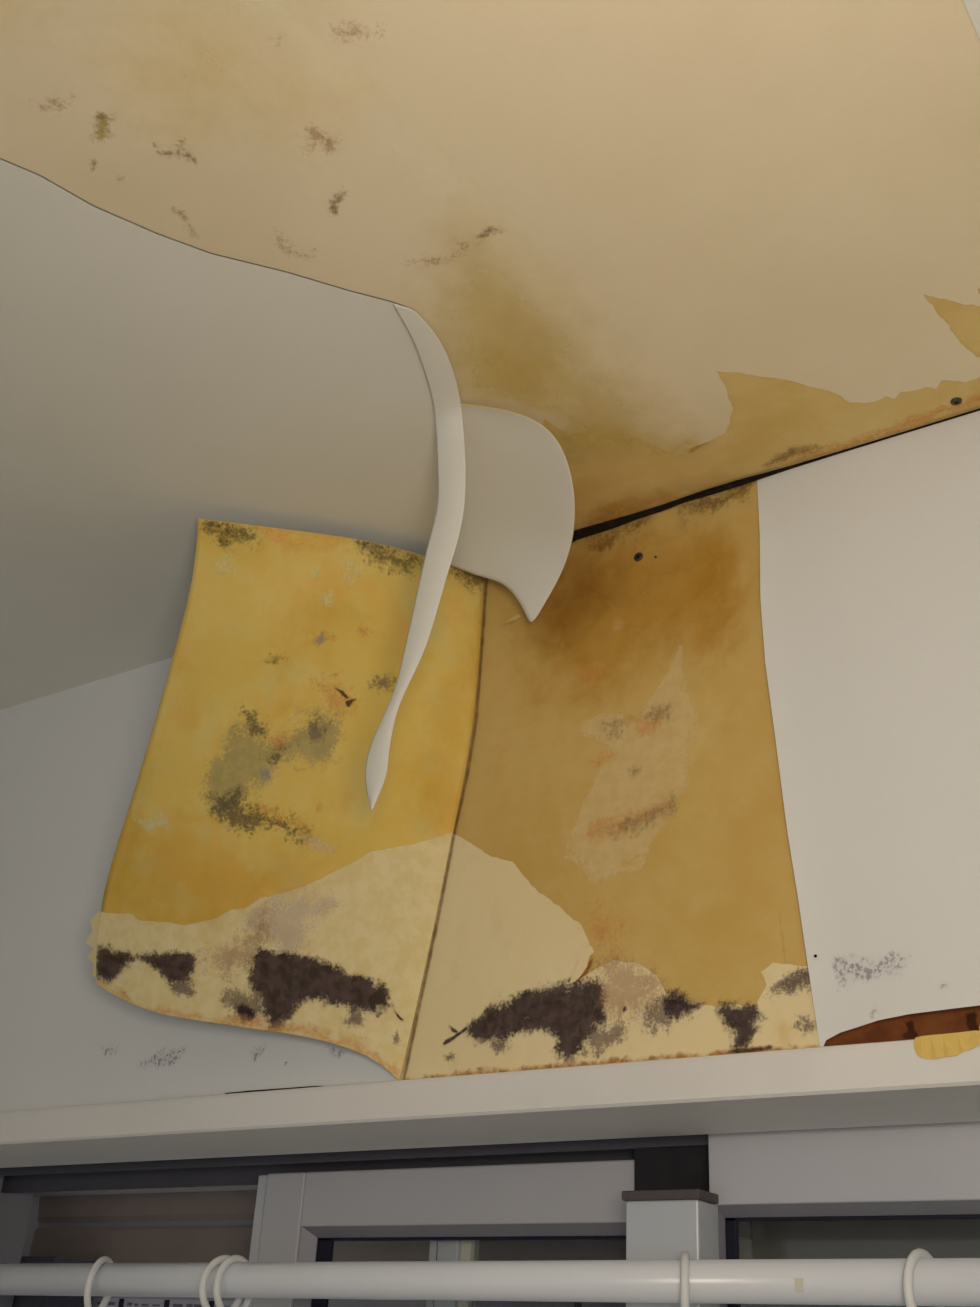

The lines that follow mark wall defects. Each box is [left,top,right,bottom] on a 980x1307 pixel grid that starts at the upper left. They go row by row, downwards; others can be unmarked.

peeling [0,0,980,812]
damp [203,520,254,546]
damp [205,711,340,843]
peeling [86,403,820,1080]
damp [96,944,196,995]
damp [221,947,403,1042]
crack [404,926,437,1077]
damp [443,977,624,1060]
damp [644,990,699,1033]
damp [718,1002,764,1050]
damp [771,969,810,994]
peeling [823,1005,980,1047]